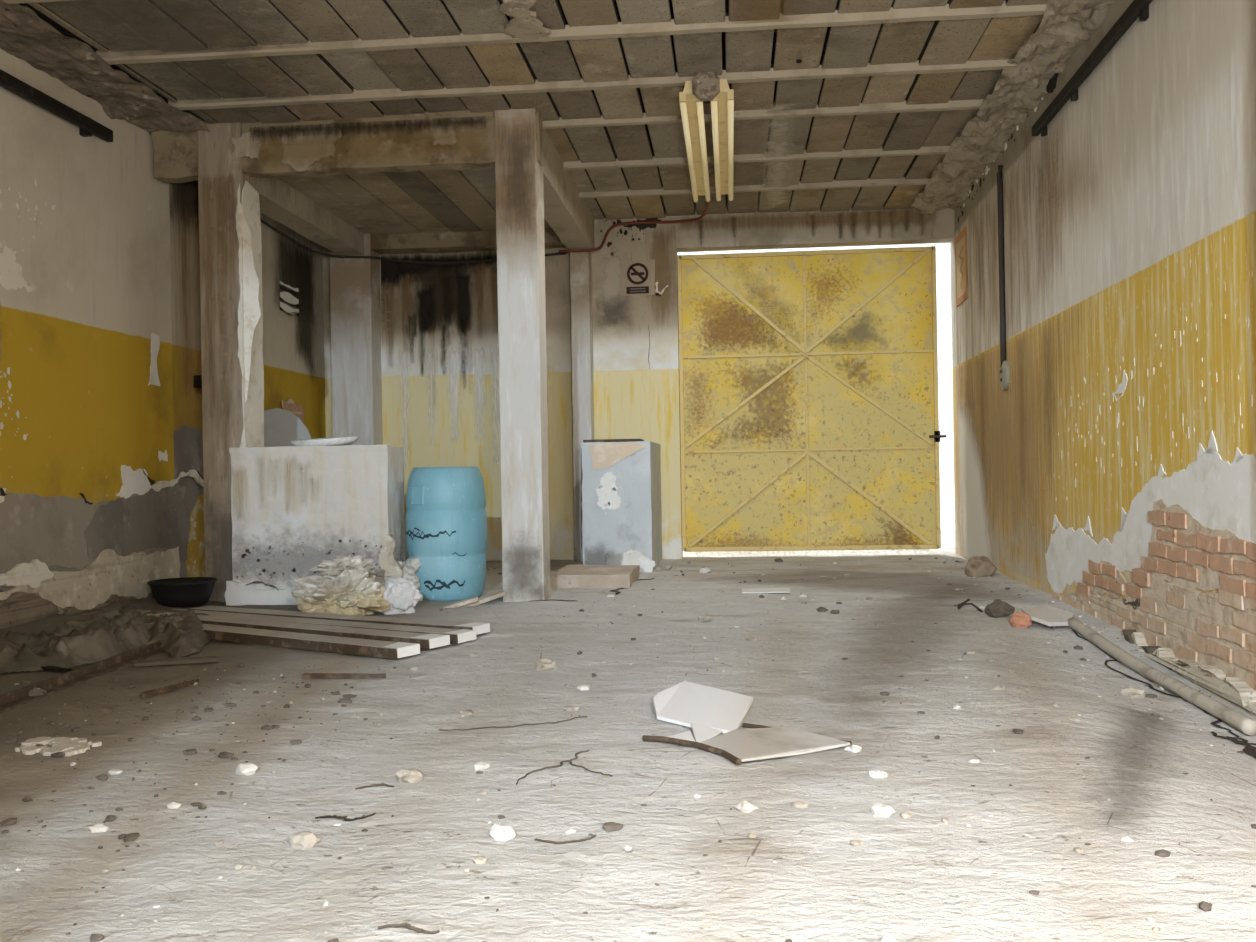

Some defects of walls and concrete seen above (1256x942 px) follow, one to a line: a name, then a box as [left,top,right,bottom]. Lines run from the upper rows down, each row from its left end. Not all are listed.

flaking render [101,105,129,120]
flaking render [958,73,1059,222]
peeling [0,367,28,440]
peeling [148,333,161,386]
damp [381,255,498,464]
flaking render [0,425,205,591]
peeling [1045,431,1256,717]
crack [438,716,588,731]
crack [516,750,612,785]
crack [1072,630,1256,758]